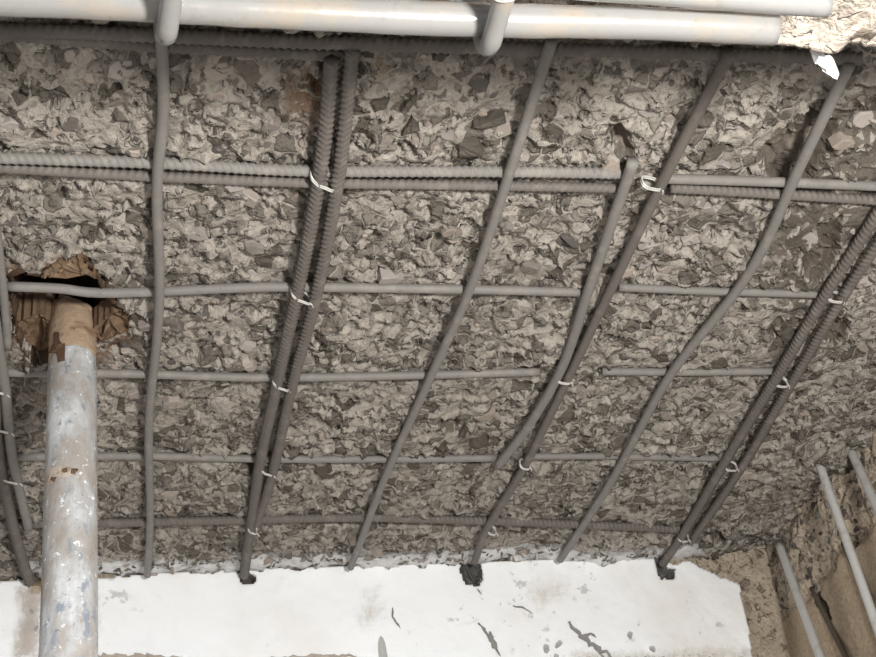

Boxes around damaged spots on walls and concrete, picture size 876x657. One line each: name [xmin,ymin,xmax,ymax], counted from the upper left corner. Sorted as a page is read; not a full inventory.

spalling [514,0,678,8]
spalling [0,17,153,28]
spalling [179,24,473,40]
spalling [556,0,876,194]
spalling [0,40,779,587]
spalling [570,200,876,657]
crack [477,622,501,657]
flaking render [543,640,563,657]
crack [568,621,612,657]